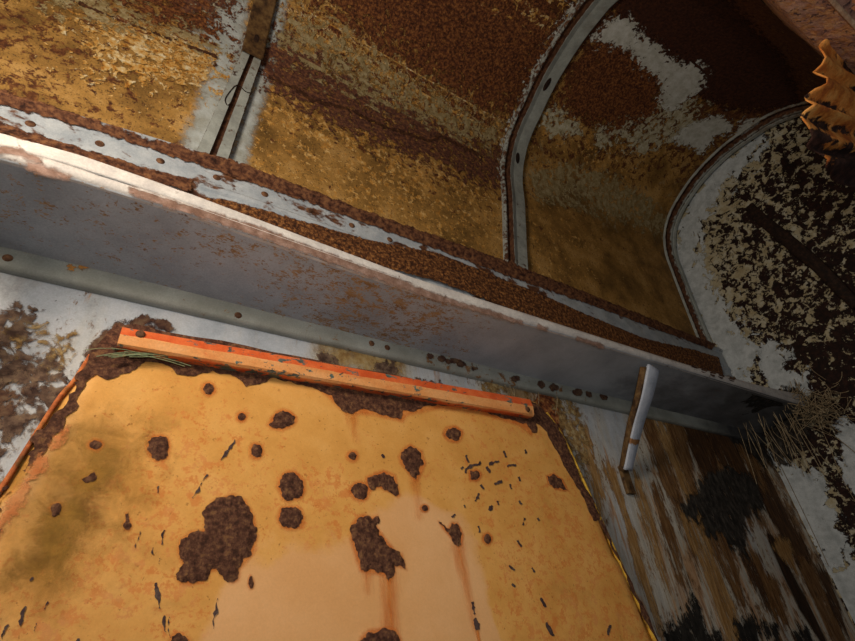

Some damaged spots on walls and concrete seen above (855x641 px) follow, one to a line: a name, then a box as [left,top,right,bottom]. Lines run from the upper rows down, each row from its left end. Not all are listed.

corrosion [85,0,251,78]
corrosion [256,0,578,204]
corrosion [545,0,803,141]
corrosion [0,89,736,382]
corrosion [0,301,176,456]
corrosion [147,435,169,461]
corrosion [176,495,257,589]
corrosion [480,376,851,641]
peeling [767,449,855,623]
peeling [830,415,855,494]
leakage [658,588,722,641]
leakage [732,606,815,641]